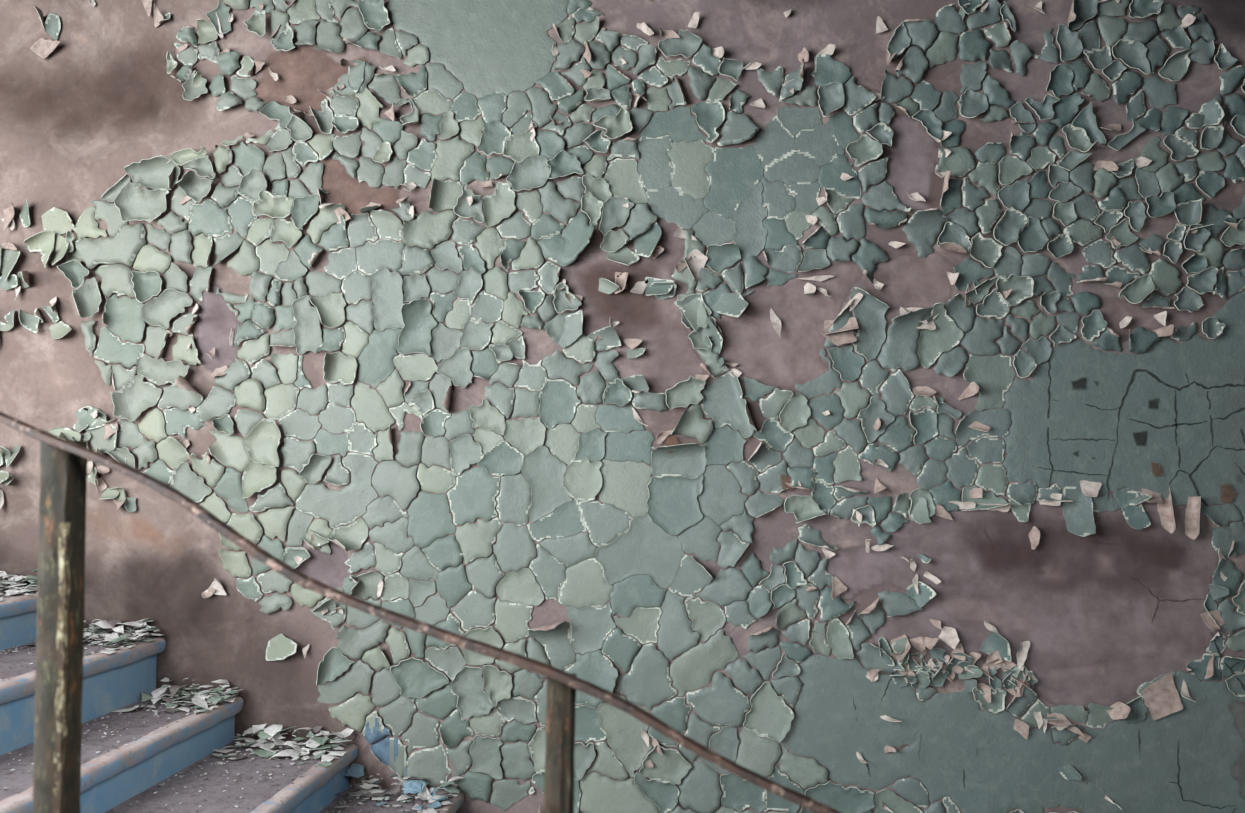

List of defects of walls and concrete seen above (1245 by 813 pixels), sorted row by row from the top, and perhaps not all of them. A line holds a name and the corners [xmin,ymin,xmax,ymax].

peeling [30,6,61,59]
peeling [171,0,240,101]
peeling [1,200,30,232]
peeling [209,0,1245,416]
peeling [0,242,29,300]
peeling [0,297,72,339]
peeling [24,103,911,569]
crack [1037,307,1245,526]
peeling [0,445,21,510]
peeling [219,227,1245,813]
water stain [1062,527,1136,548]
peeling [202,578,227,599]